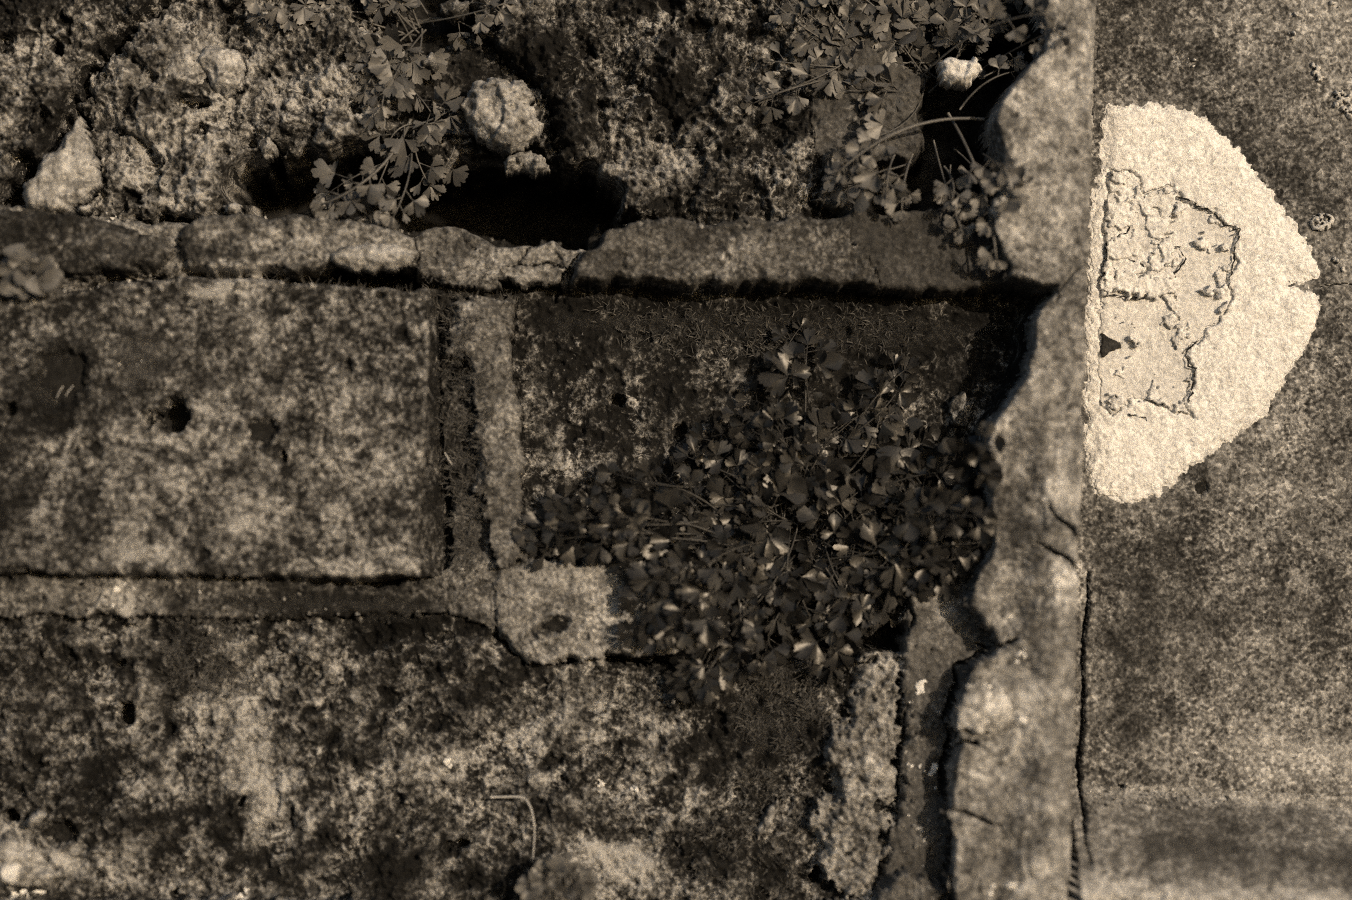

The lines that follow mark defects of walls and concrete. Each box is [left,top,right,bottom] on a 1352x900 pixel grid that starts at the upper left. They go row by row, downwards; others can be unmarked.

peeling [1083,101,1321,504]
crack [894,704,908,827]
crack [938,638,1017,900]
crack [1035,509,1091,868]